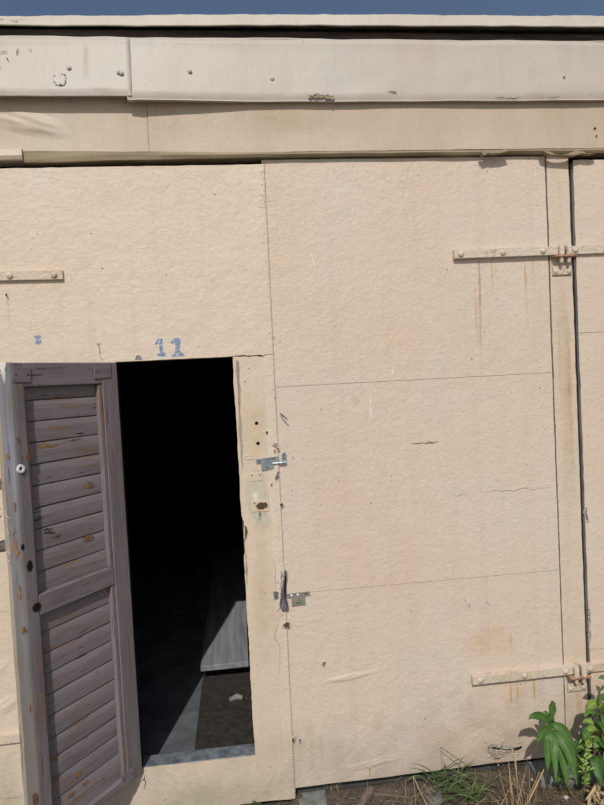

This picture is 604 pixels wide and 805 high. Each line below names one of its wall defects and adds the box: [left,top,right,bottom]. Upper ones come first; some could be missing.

spalling [485,739,522,765]